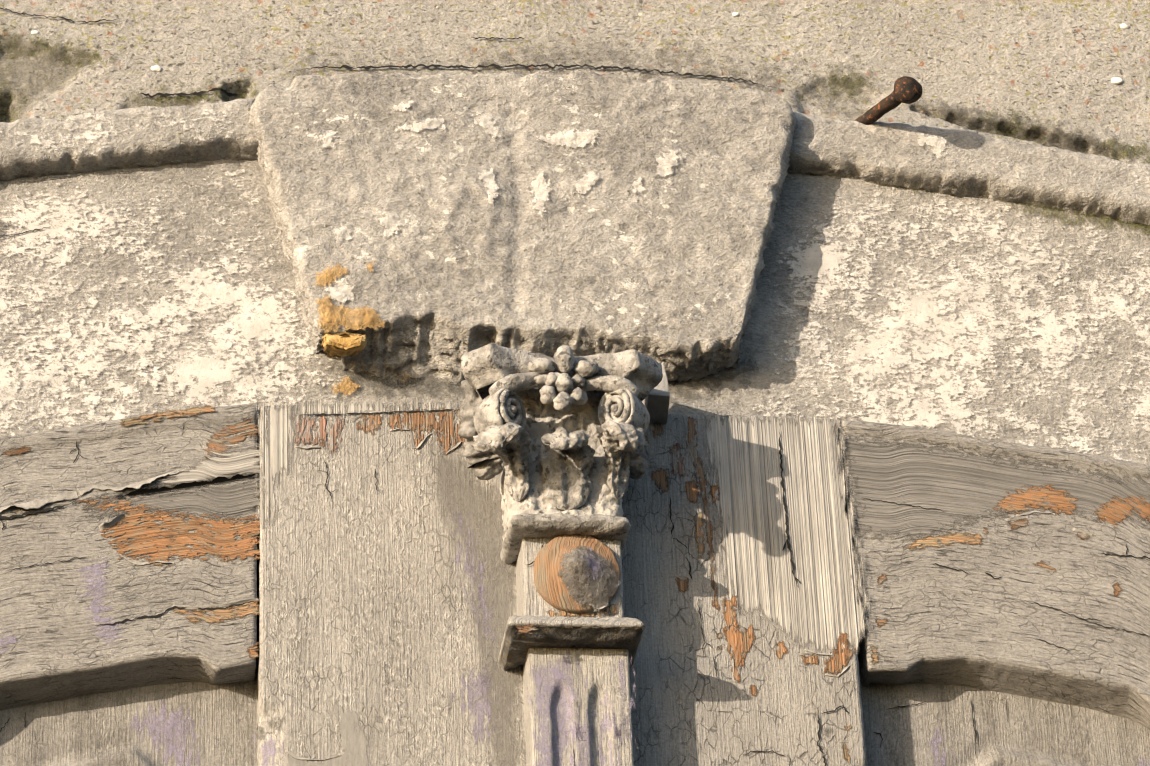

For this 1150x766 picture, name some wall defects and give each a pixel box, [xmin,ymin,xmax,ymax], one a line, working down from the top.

peeling [321,133,336,149]
spalling [911,100,1150,187]
peeling [0,169,466,566]
peeling [650,188,1150,696]
crack [779,432,801,588]
peeling [173,598,260,624]
crack [669,498,719,681]
crack [817,705,850,766]
crack [873,701,927,748]